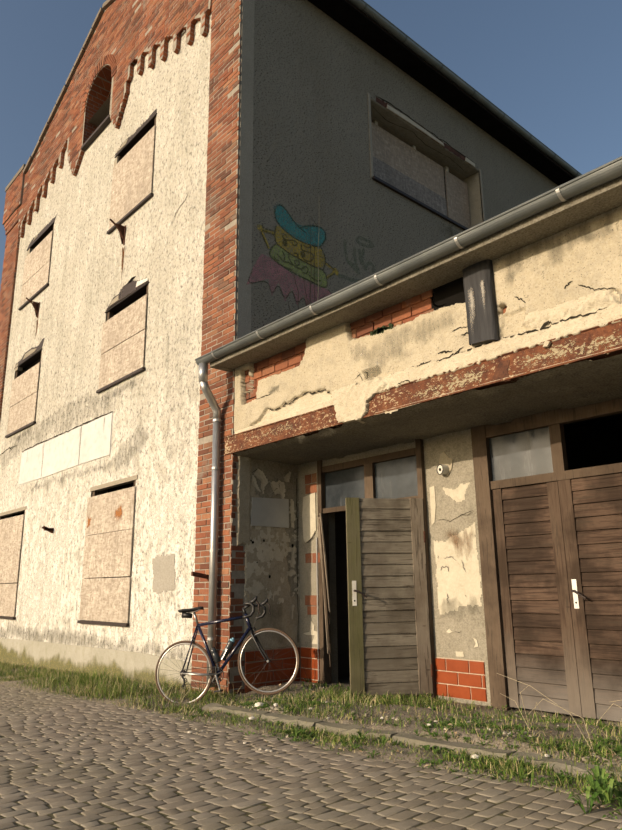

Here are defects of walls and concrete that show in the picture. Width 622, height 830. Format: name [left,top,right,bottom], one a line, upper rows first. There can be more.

peeling [387,105,444,147]
flaking render [245,342,306,403]
flaking render [350,289,434,338]
peeling [408,365,484,399]
crack [398,281,616,384]
peeling [517,330,622,371]
spalling [524,288,622,329]
spalling [247,389,335,440]
peeling [430,482,470,525]
peeling [244,457,320,644]
peeling [434,522,482,615]